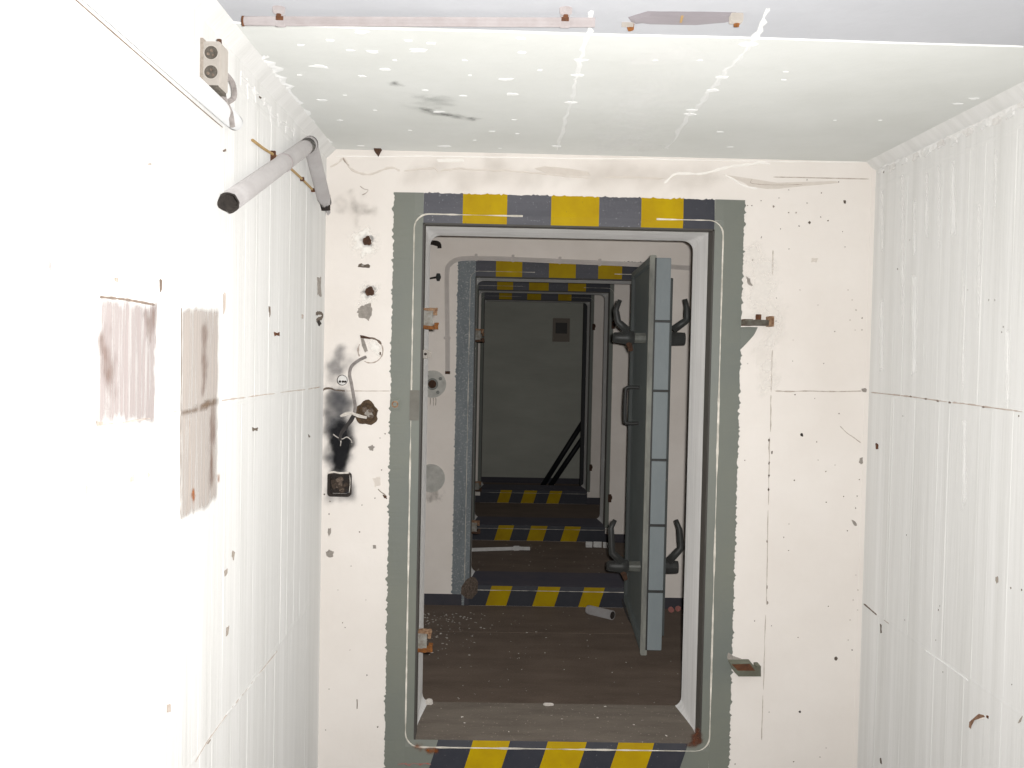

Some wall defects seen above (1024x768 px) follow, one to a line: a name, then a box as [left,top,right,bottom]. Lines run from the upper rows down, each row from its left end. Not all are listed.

spalling [353,228,373,268]
spalling [357,286,375,321]